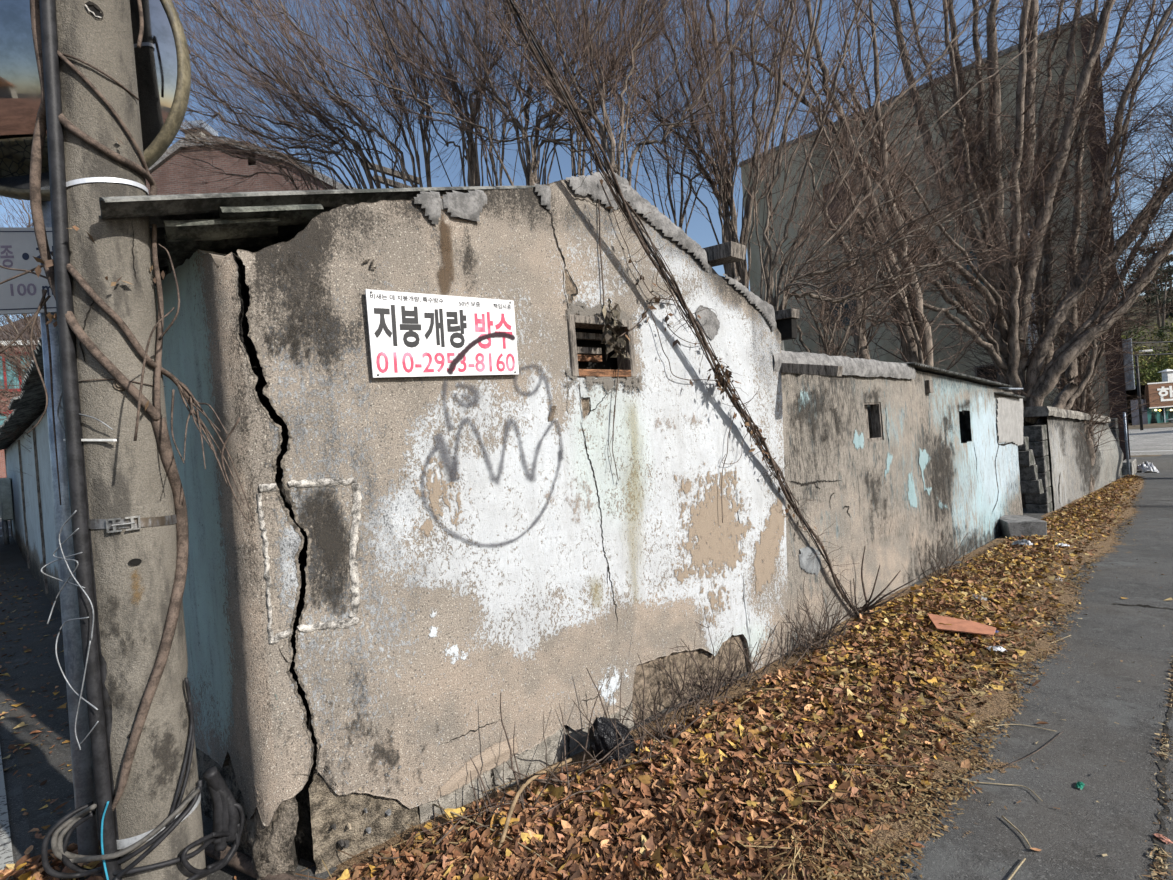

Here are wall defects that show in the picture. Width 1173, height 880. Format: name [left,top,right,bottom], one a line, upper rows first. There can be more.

crack [534,191,566,269]
crack [565,180,609,209]
spalling [581,397,591,421]
crack [236,255,321,871]
water stain [281,486,351,616]
peeling [401,456,473,548]
peeling [545,478,594,521]
crack [567,384,618,630]
peeling [671,460,788,629]
peeling [429,609,471,666]
spalling [595,634,748,729]
spalling [196,725,592,880]